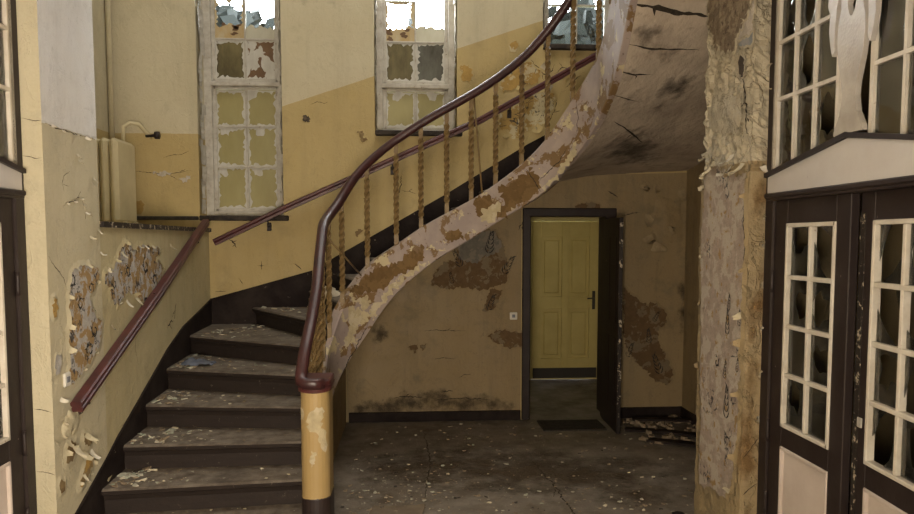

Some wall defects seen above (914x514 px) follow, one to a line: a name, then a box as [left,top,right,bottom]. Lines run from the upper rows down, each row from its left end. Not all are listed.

peeling [355,0,474,144]
peeling [498,60,570,142]
crack [617,72,650,102]
crack [629,43,697,51]
crack [637,4,708,17]
flaking render [705,0,752,80]
peeling [343,146,577,351]
peeling [49,235,172,403]
peeling [622,285,676,387]
peeling [55,427,101,501]
peeling [300,407,327,465]